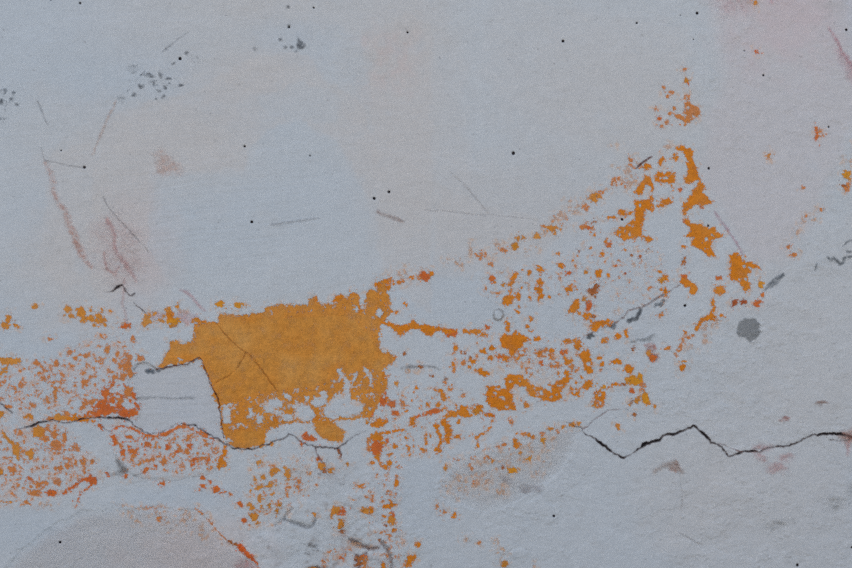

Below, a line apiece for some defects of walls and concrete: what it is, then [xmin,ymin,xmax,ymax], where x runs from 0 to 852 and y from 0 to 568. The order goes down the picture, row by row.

peeling [654,66,701,128]
peeling [0,144,723,568]
peeling [664,249,767,372]
crack [0,403,163,433]
crack [156,357,347,461]
crack [573,425,852,459]